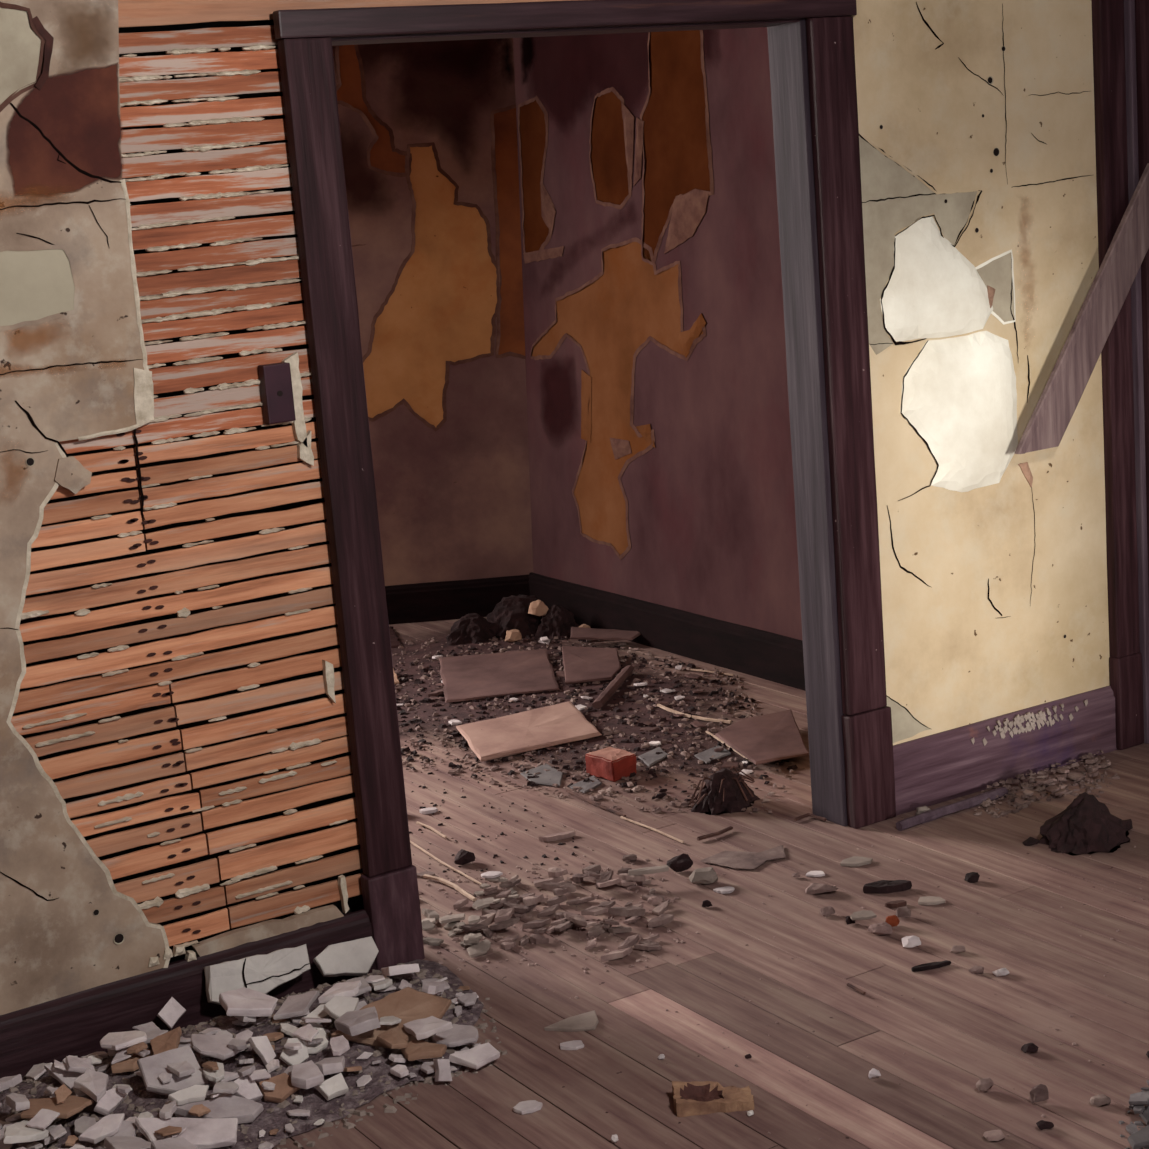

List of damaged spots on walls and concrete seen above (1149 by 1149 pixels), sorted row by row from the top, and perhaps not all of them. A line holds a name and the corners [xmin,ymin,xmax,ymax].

spalling [152,73,214,81]
spalling [119,20,274,33]
spalling [120,92,283,108]
spalling [207,45,278,53]
spalling [209,140,288,151]
peeling [622,102,644,190]
crack [859,134,936,203]
crack [916,2,1091,244]
peeling [859,131,979,358]
peeling [975,249,1015,325]
spalling [0,167,364,968]
peeling [1018,462,1035,606]